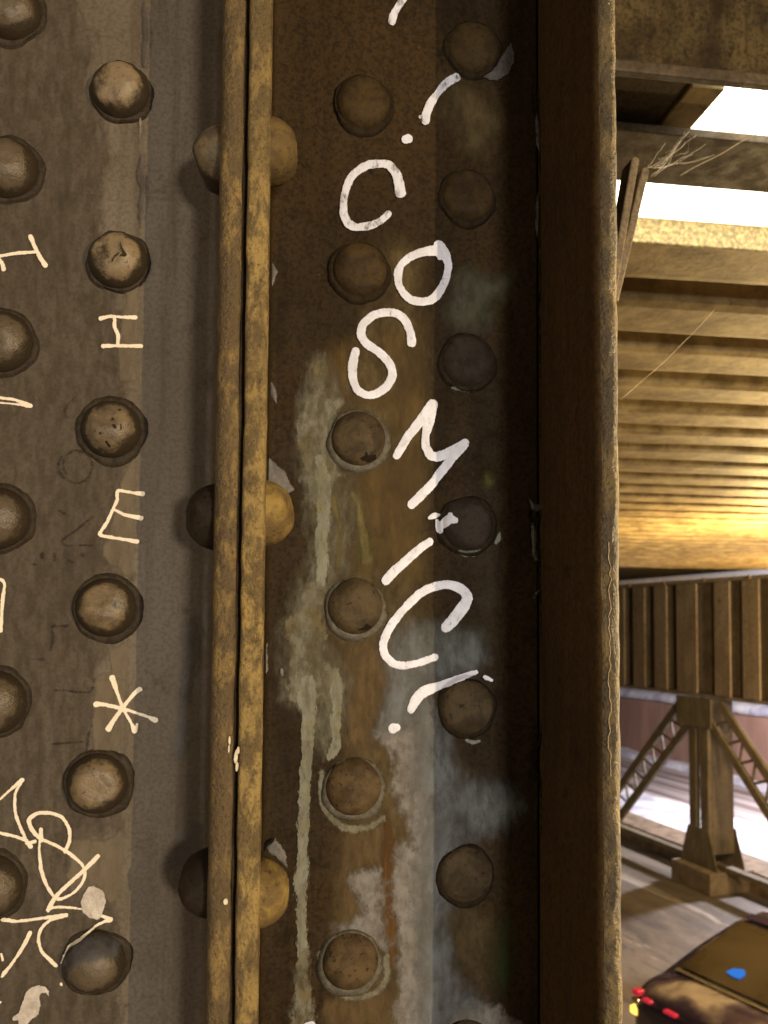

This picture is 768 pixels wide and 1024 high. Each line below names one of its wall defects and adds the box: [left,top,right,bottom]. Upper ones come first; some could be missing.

corrosion [322,345,379,404]
corrosion [346,331,423,580]
corrosion [326,638,394,751]
leakage [276,250,514,1024]
corrosion [339,818,397,967]
corrosion [321,990,393,1024]